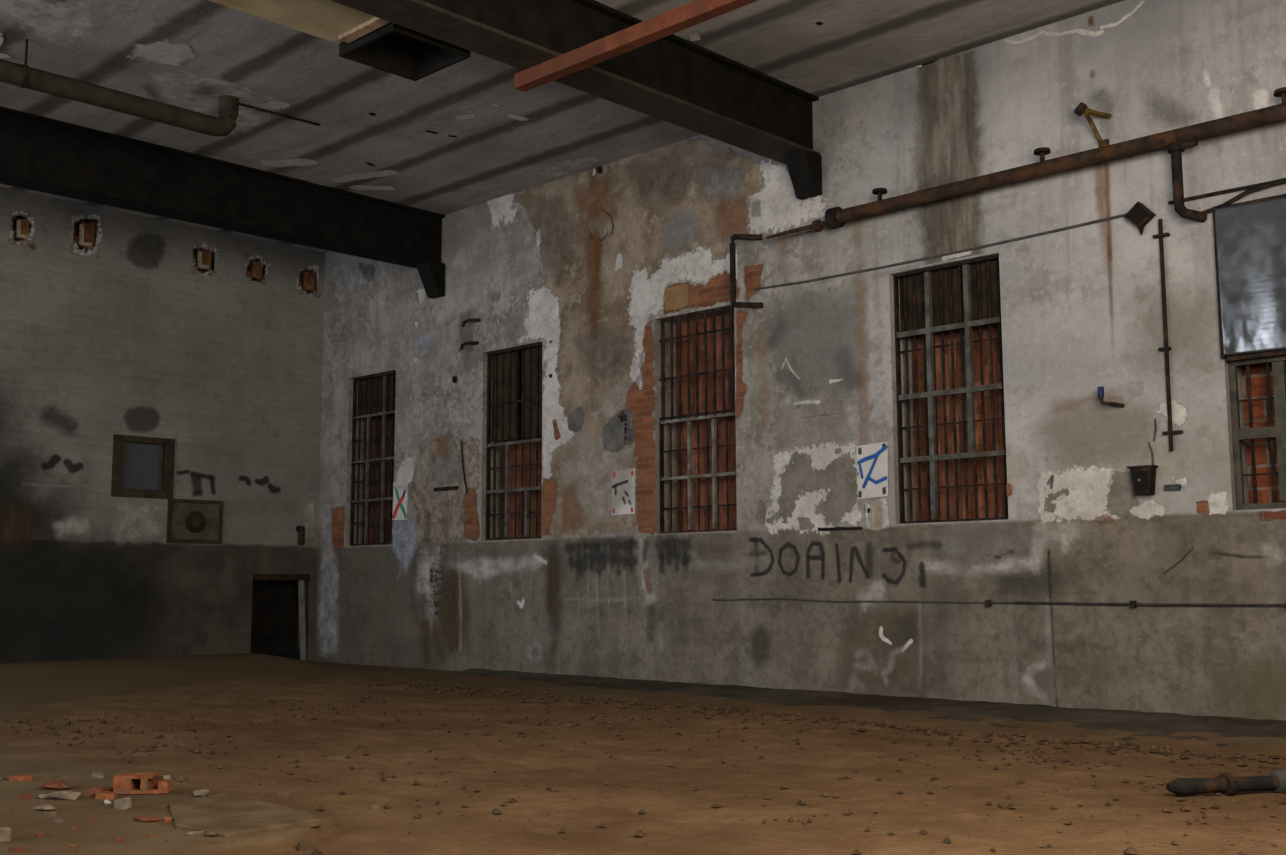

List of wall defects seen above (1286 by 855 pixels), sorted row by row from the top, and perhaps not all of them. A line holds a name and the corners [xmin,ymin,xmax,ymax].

water stain [918,51,980,262]
spalling [7,210,35,250]
hole [70,214,103,257]
spalling [191,242,220,276]
spalling [244,254,270,285]
rust [1102,164,1111,269]
spalling [487,137,764,617]
peeling [755,437,862,536]
peeling [1035,463,1166,525]